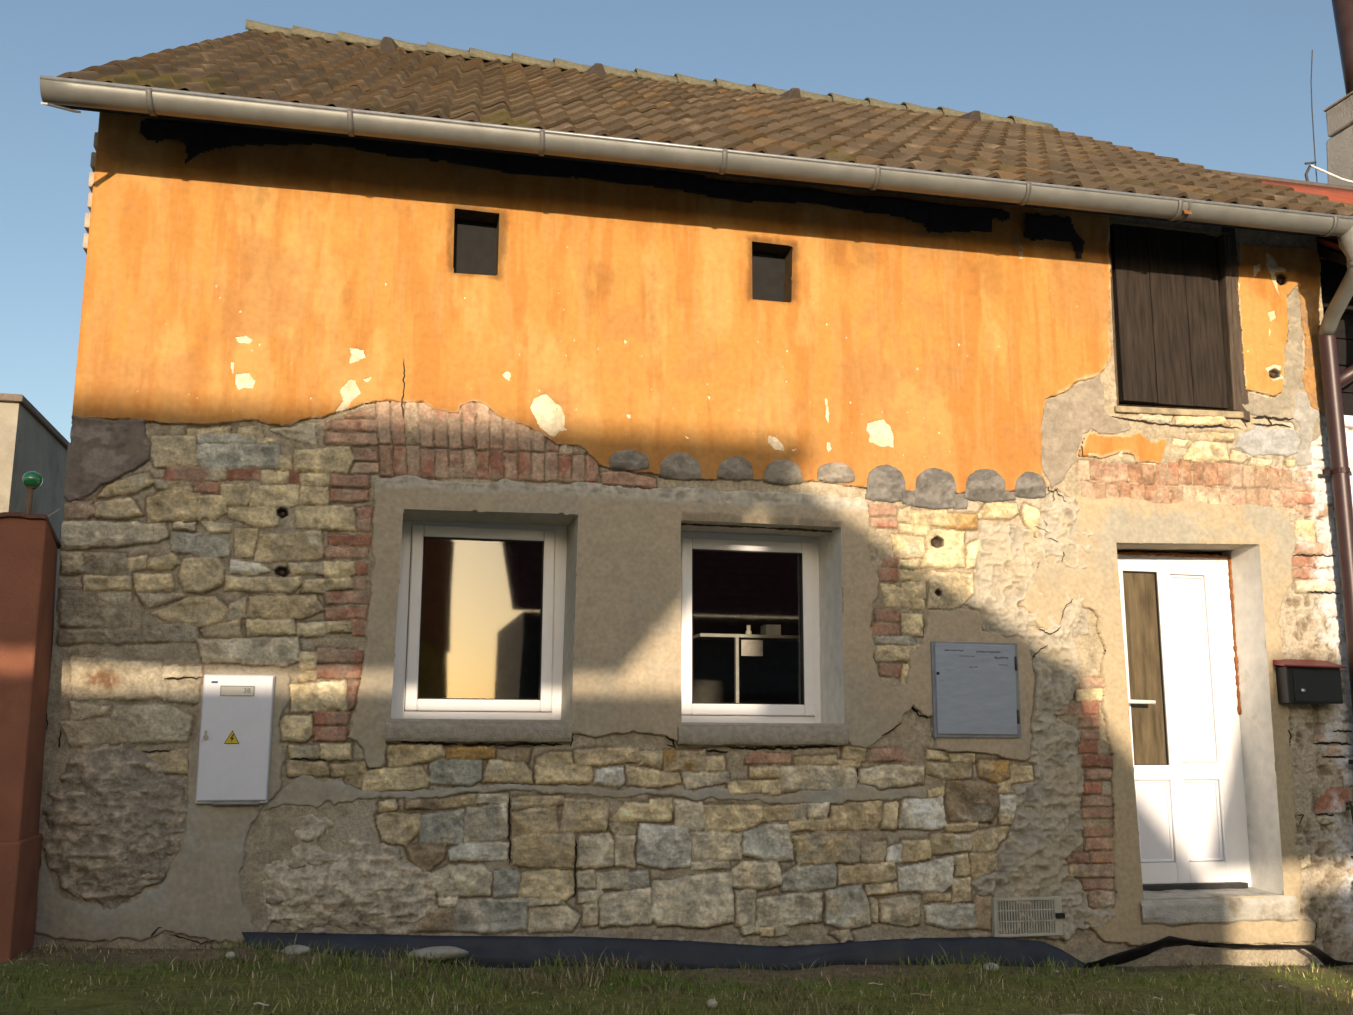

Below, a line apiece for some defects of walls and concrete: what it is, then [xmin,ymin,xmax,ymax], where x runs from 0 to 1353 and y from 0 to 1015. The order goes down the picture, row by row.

peeling [1253,254,1286,293]
peeling [231,362,255,390]
crack [399,361,407,418]
peeling [852,411,904,463]